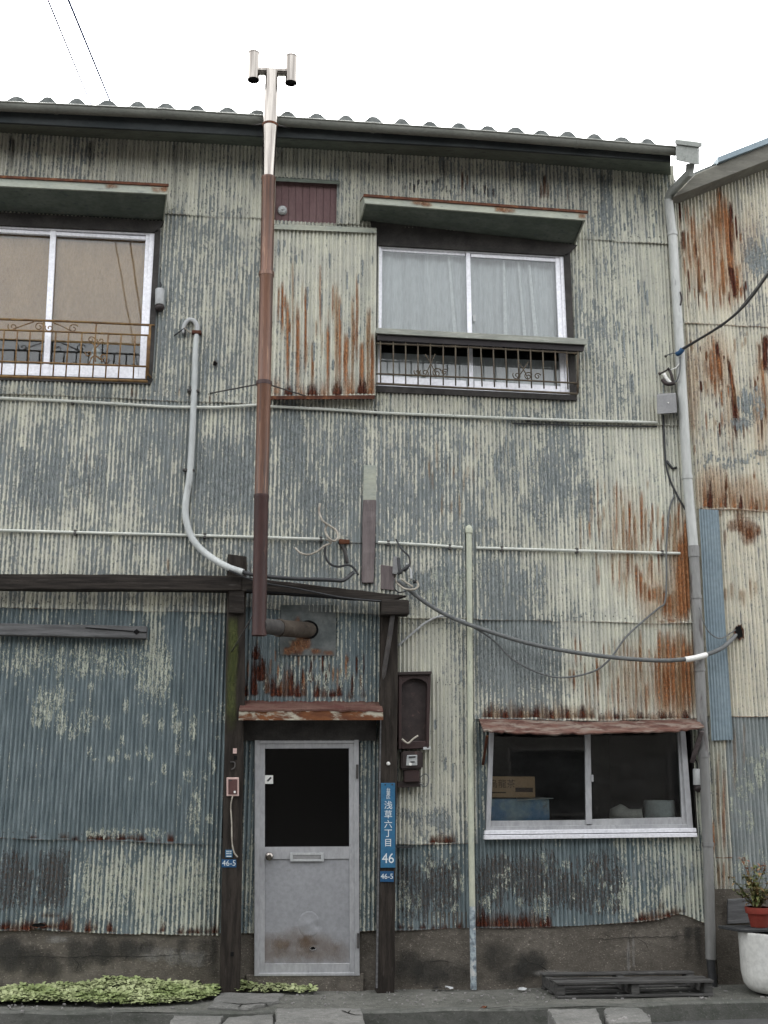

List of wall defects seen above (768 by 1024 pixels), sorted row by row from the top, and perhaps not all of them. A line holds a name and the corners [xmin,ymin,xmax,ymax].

rust [679,191,747,308]
rust [274,276,374,396]
rust [690,341,744,444]
rust [749,335,768,438]
rust [616,491,690,623]
rust [703,475,767,542]
rust [245,638,365,698]
rust [482,636,694,720]
peeling [0,637,225,835]
rust [476,906,552,927]